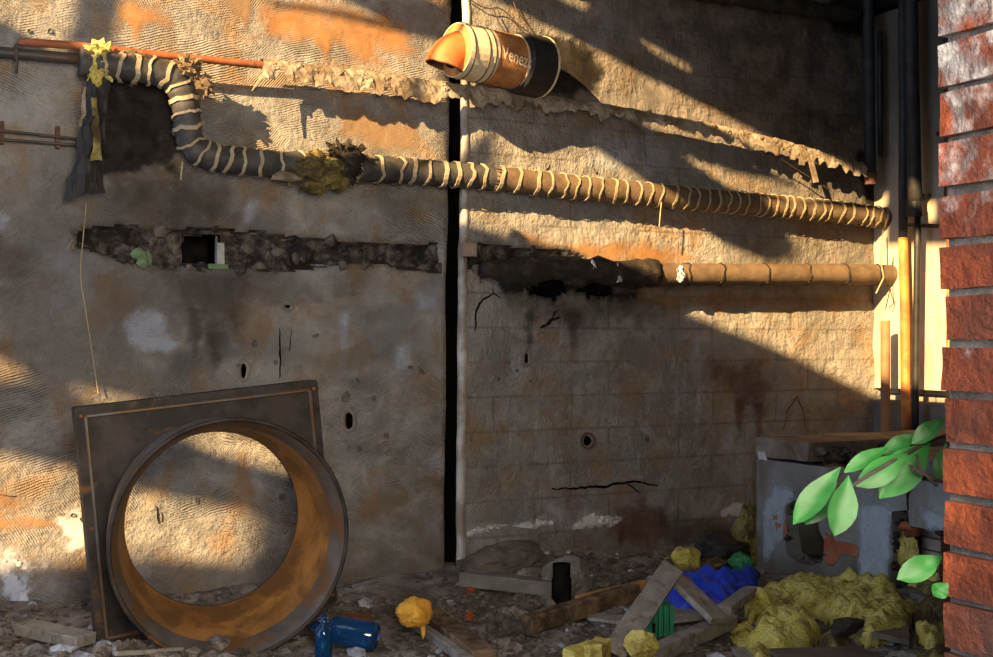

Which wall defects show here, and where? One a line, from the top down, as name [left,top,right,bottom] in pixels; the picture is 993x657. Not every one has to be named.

crack [552,480,657,494]
peeling [923,510,944,529]
peeling [823,505,892,578]